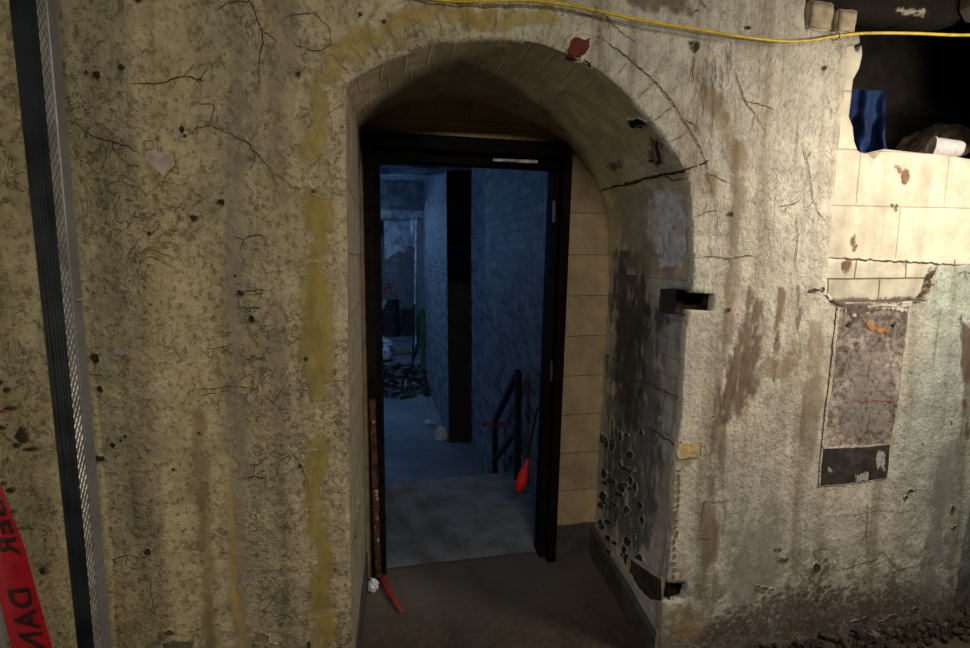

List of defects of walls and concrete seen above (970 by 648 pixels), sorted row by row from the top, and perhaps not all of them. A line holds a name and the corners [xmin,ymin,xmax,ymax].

crack [218,0,332,85]
crack [596,14,759,269]
spalling [804,0,970,150]
leakage [300,186,334,404]
leakage [715,184,786,470]
peeling [822,303,911,449]
leakage [305,434,334,648]
peeling [596,427,646,565]
leakage [701,505,718,605]